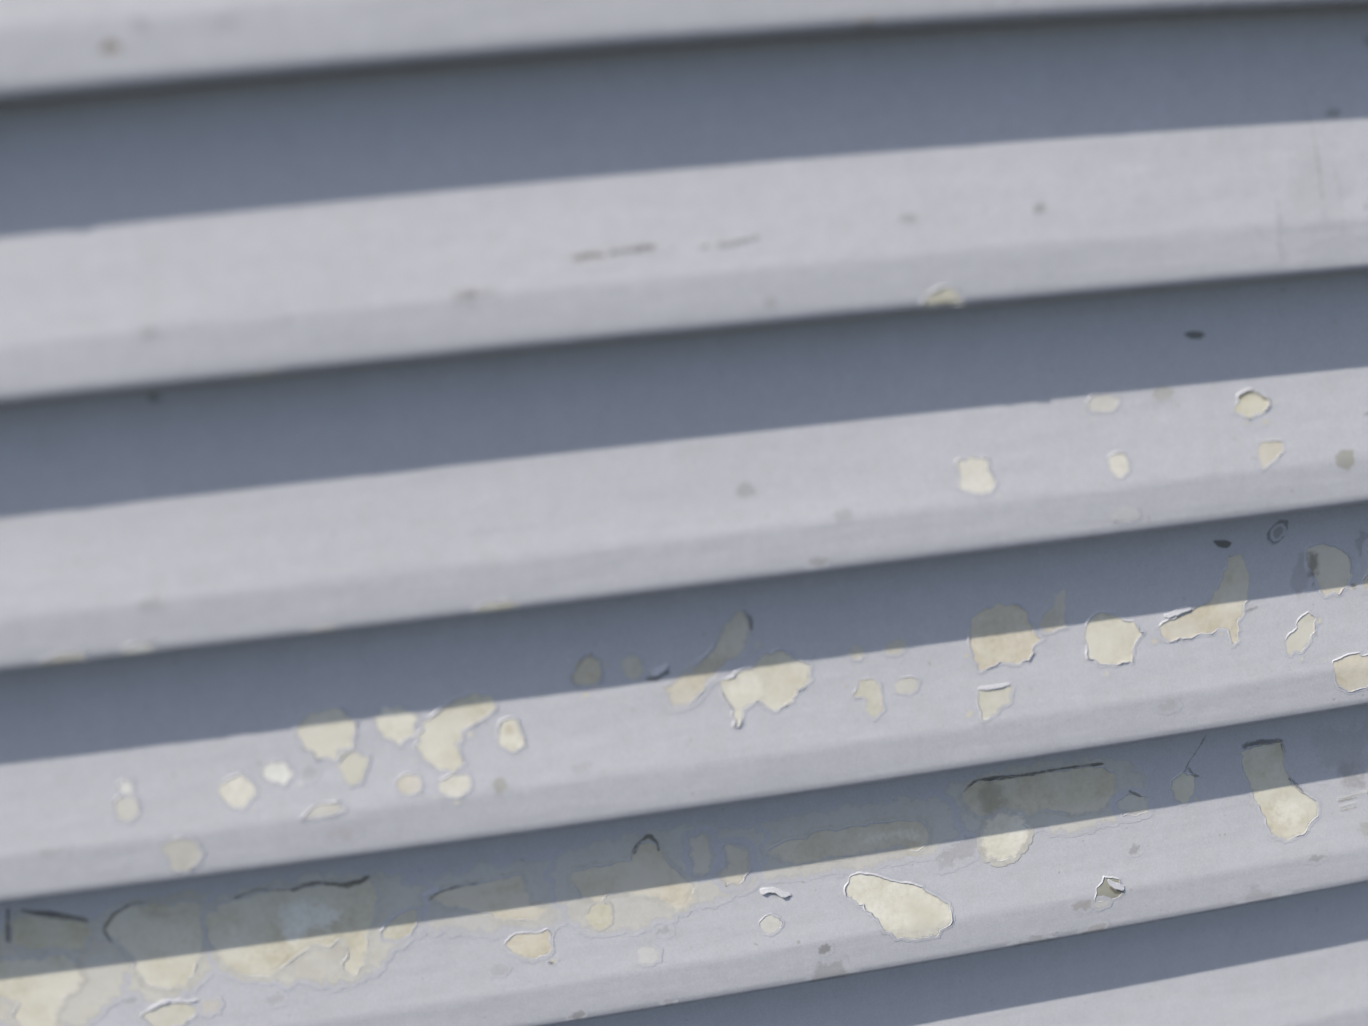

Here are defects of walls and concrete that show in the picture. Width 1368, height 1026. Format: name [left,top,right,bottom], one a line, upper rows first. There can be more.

peeling [954,453,1001,499]
peeling [1232,387,1285,472]
peeling [568,604,815,730]
peeling [962,536,1253,723]
peeling [1264,517,1356,663]
peeling [1322,650,1368,695]
peeling [215,689,528,823]
peeling [1237,737,1321,844]
peeling [0,750,1154,1026]